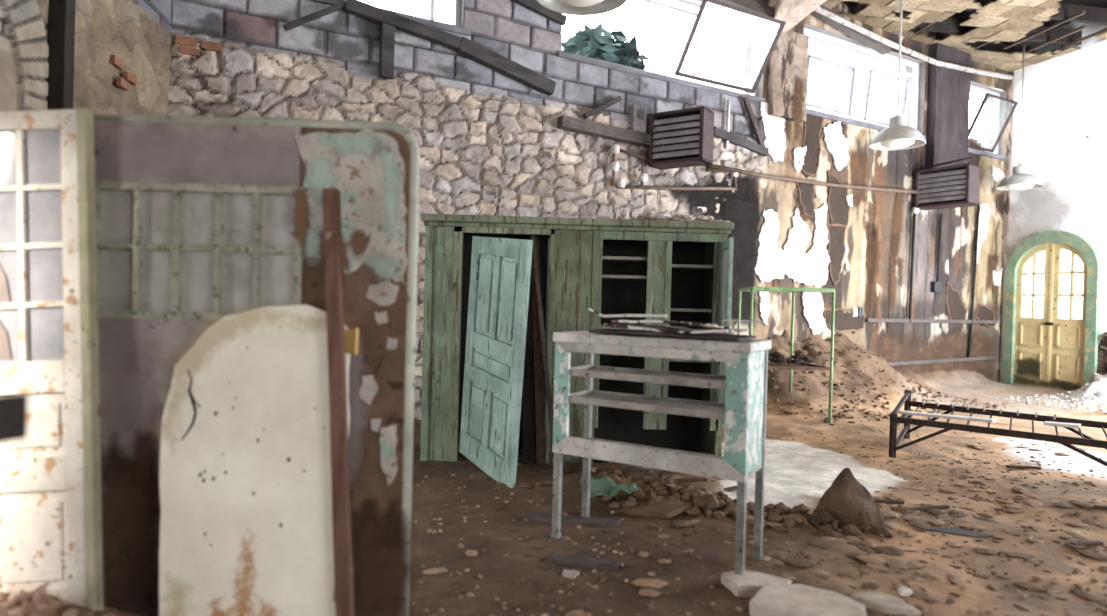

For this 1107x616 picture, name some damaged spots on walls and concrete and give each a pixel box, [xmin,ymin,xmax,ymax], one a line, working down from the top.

flaking render [755,102,866,335]
flaking render [968,138,1005,264]
flaking render [992,268,1002,286]